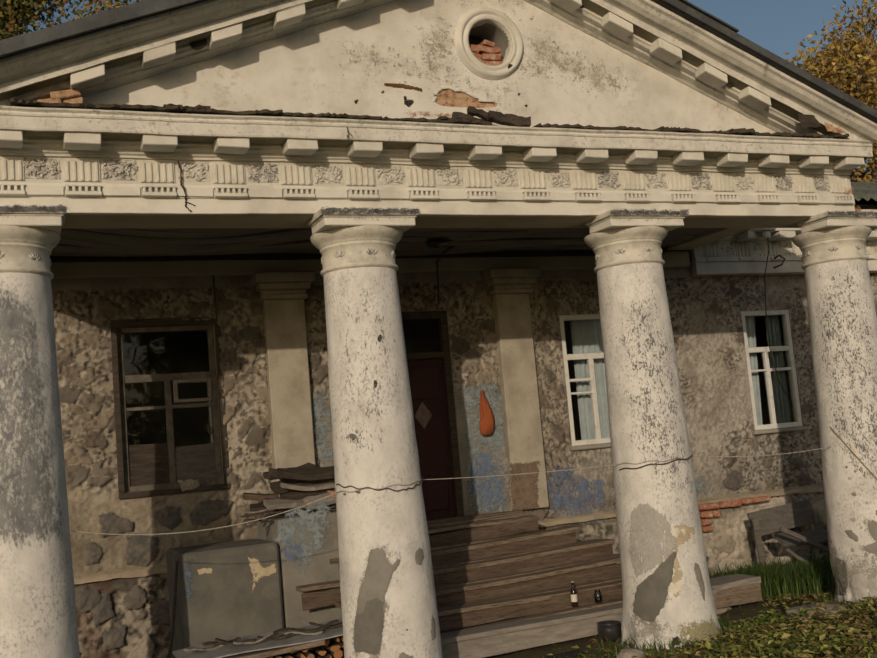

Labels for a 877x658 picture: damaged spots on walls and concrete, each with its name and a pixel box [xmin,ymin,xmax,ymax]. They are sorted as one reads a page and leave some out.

flaking render [381,83,499,108]
crack [178,161,196,212]
water stain [0,291,62,546]
peeling [462,381,606,523]
peeling [275,502,331,574]
flaking render [248,557,276,593]